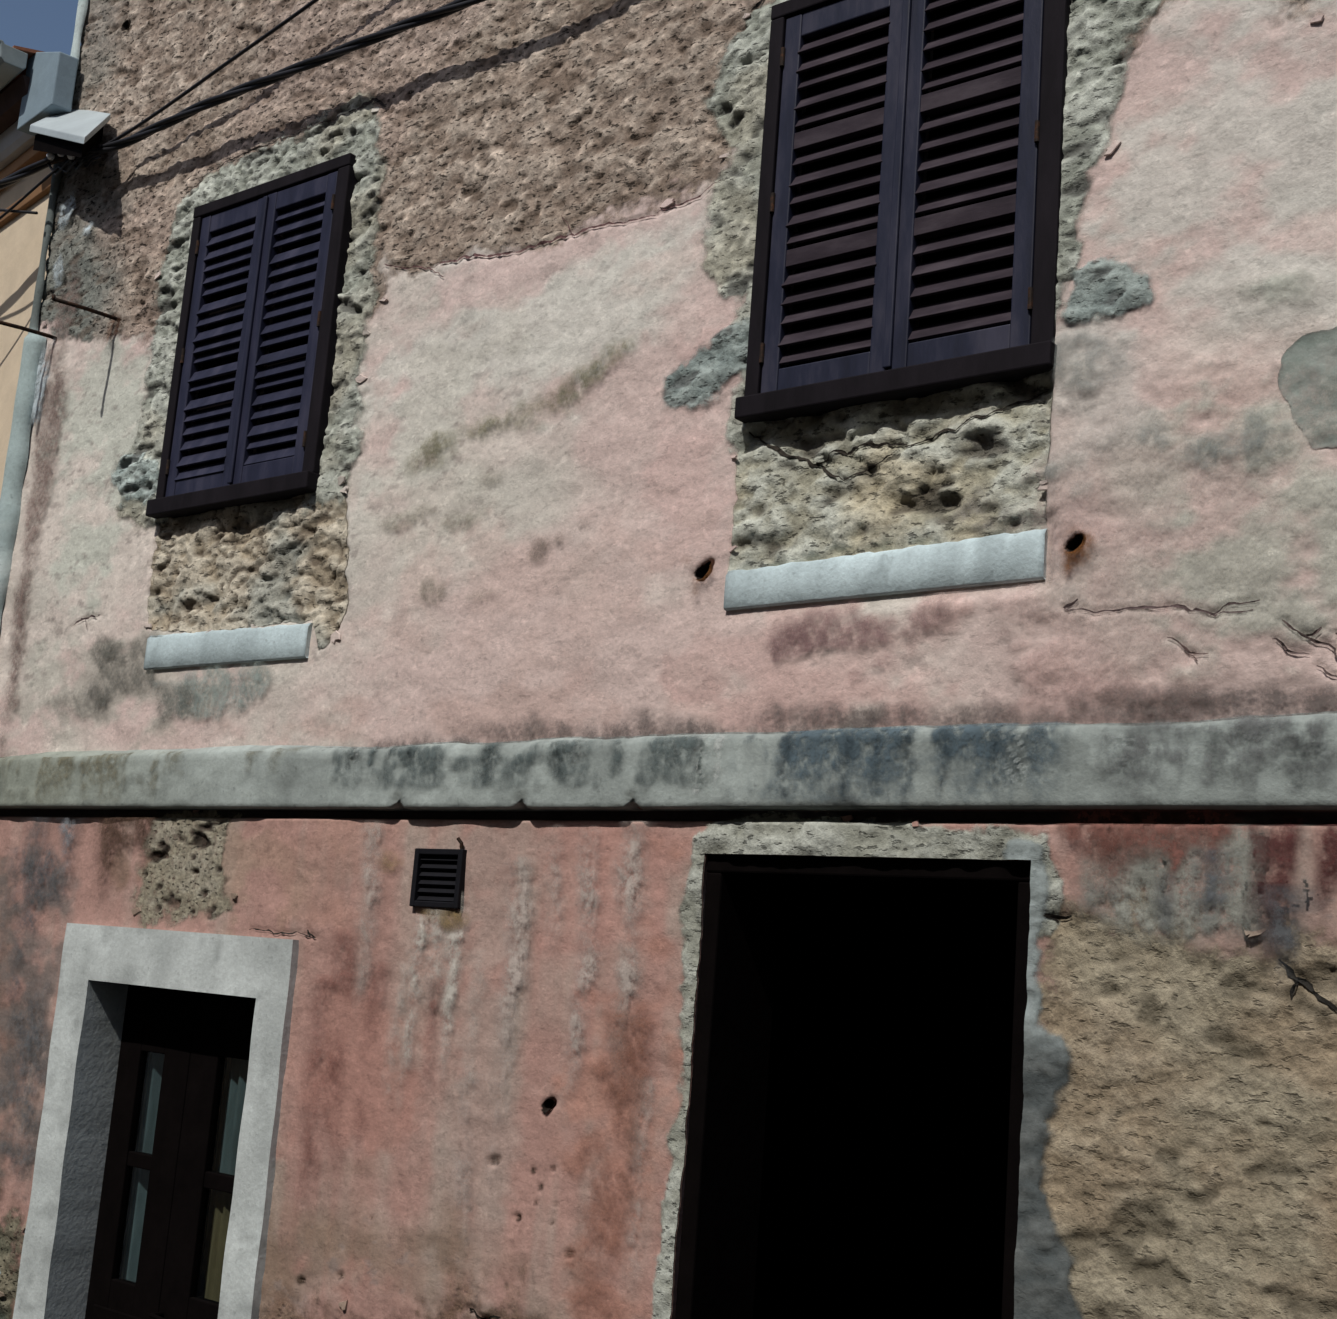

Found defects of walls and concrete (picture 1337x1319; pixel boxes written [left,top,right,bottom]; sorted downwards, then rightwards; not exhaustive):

flaking render [727,371,1053,573]
crack [749,391,1048,481]
flaking render [143,476,349,649]
rust [1064,531,1092,571]
crack [1063,598,1337,677]
water stain [333,713,729,792]
water stain [747,701,1057,794]
flaking render [131,810,242,928]
water stain [1084,824,1297,950]
water stain [410,908,463,1029]
crack [1278,958,1337,1011]
flaking render [1036,809,1337,1319]